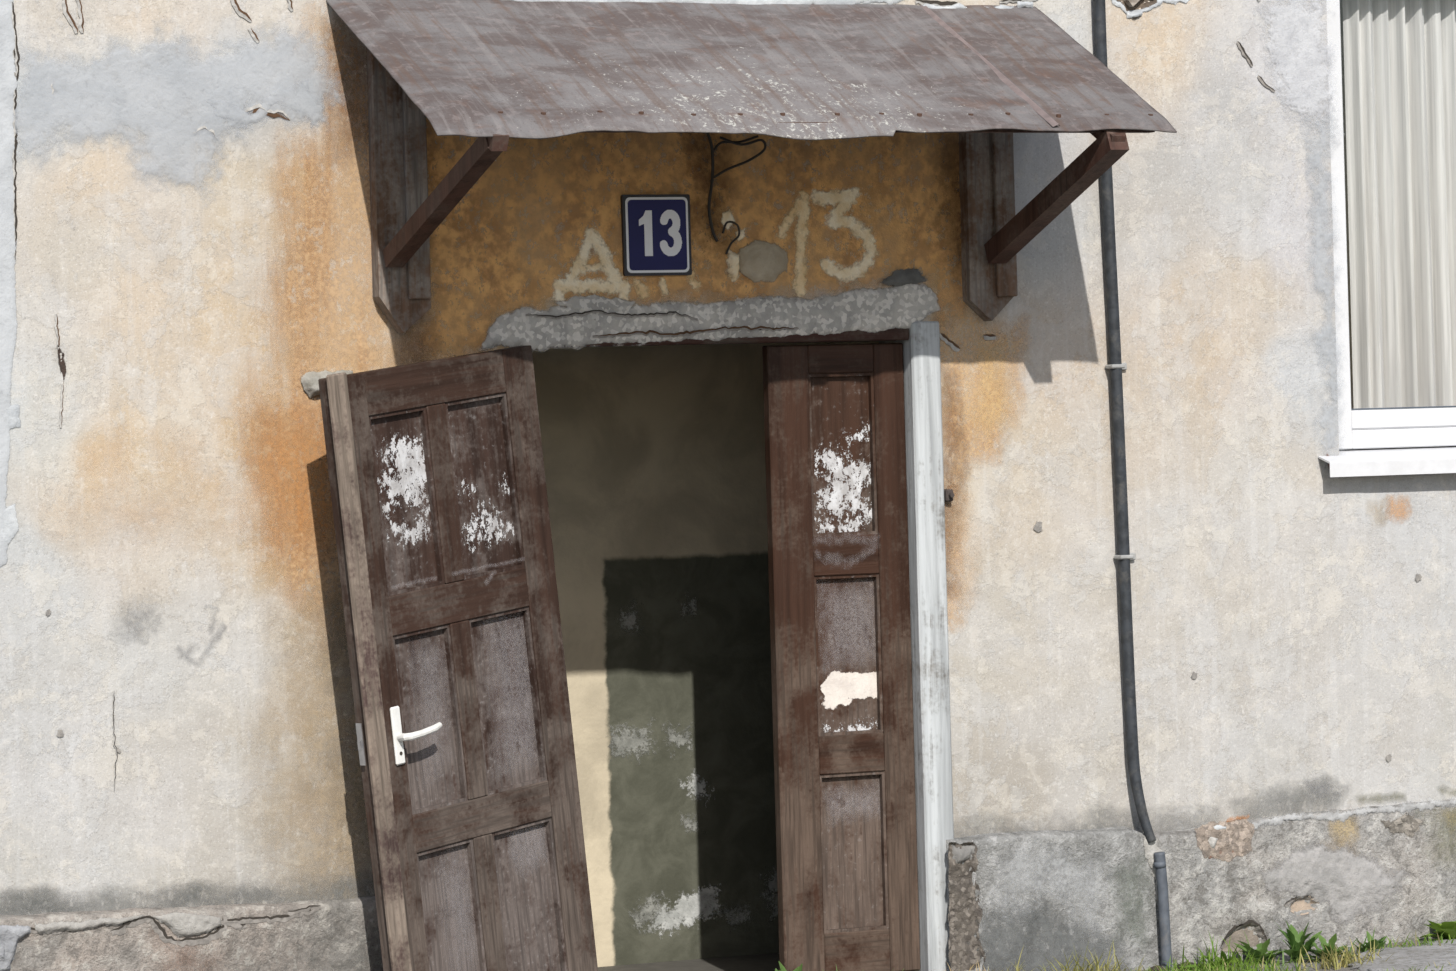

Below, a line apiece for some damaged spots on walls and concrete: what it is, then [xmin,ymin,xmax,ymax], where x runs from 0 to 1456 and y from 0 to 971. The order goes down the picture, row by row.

crack [62,0,84,34]
crack [231,0,260,43]
flaking render [1112,0,1189,19]
crack [1237,41,1275,92]
rust [251,26,385,628]
crack [525,310,799,338]
water stain [0,631,375,915]
flaking render [1194,815,1255,862]
flaking render [0,912,221,971]
crack [111,905,321,947]
flaking render [948,842,986,971]
flaking render [1221,920,1267,954]